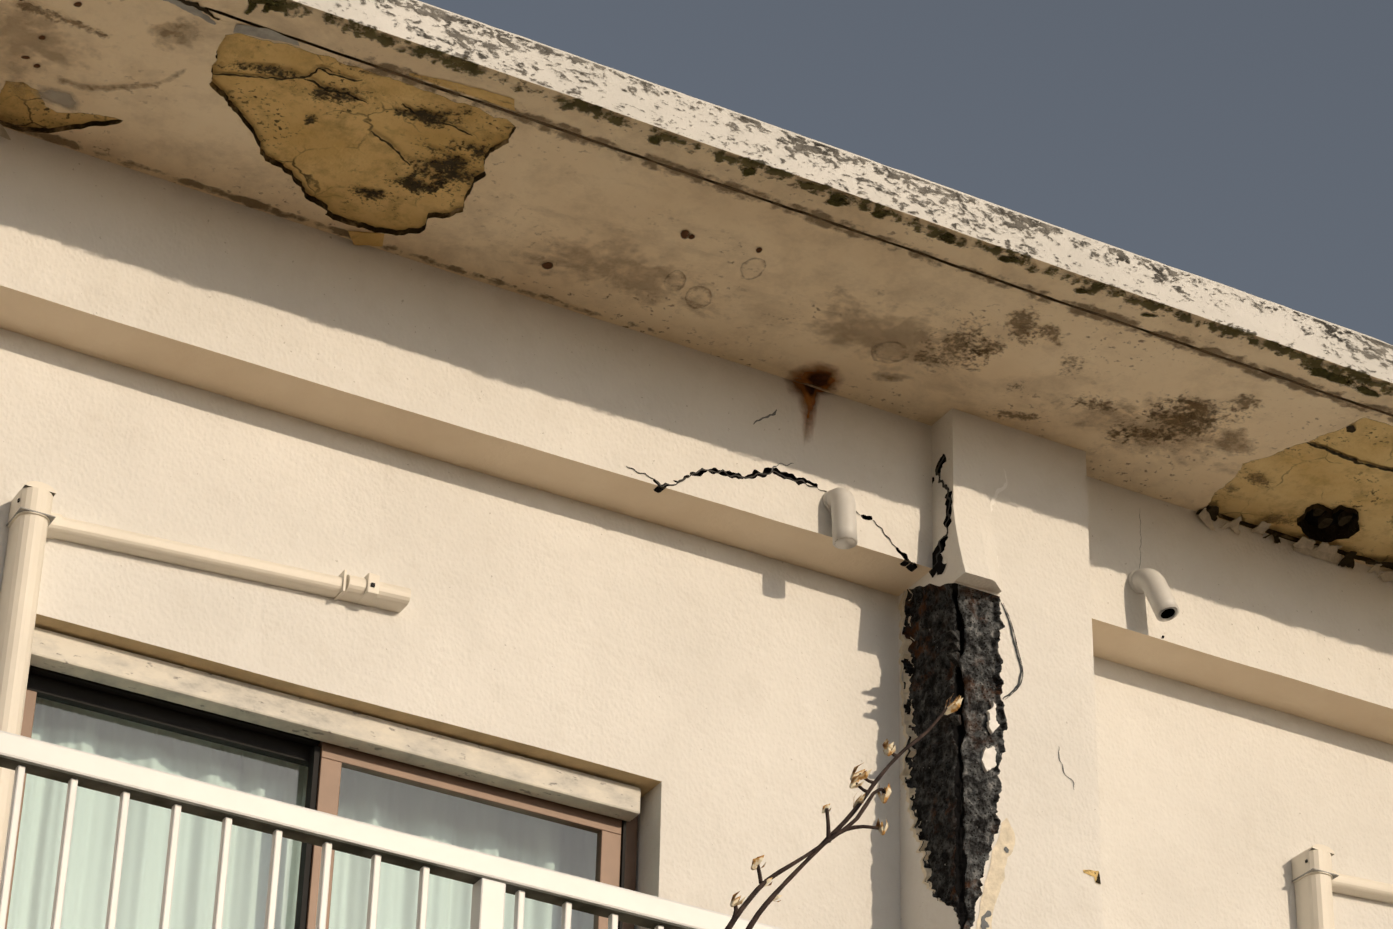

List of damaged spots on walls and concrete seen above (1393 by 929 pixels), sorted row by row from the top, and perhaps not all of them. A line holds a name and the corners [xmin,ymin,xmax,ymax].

peeling [0,81,123,140]
peeling [163,0,516,247]
crack [626,463,827,493]
corrosion [789,367,838,430]
crack [856,454,952,578]
leakage [1108,394,1261,449]
peeling [1196,418,1393,582]
crack [997,556,1023,699]
spalling [898,583,1015,929]